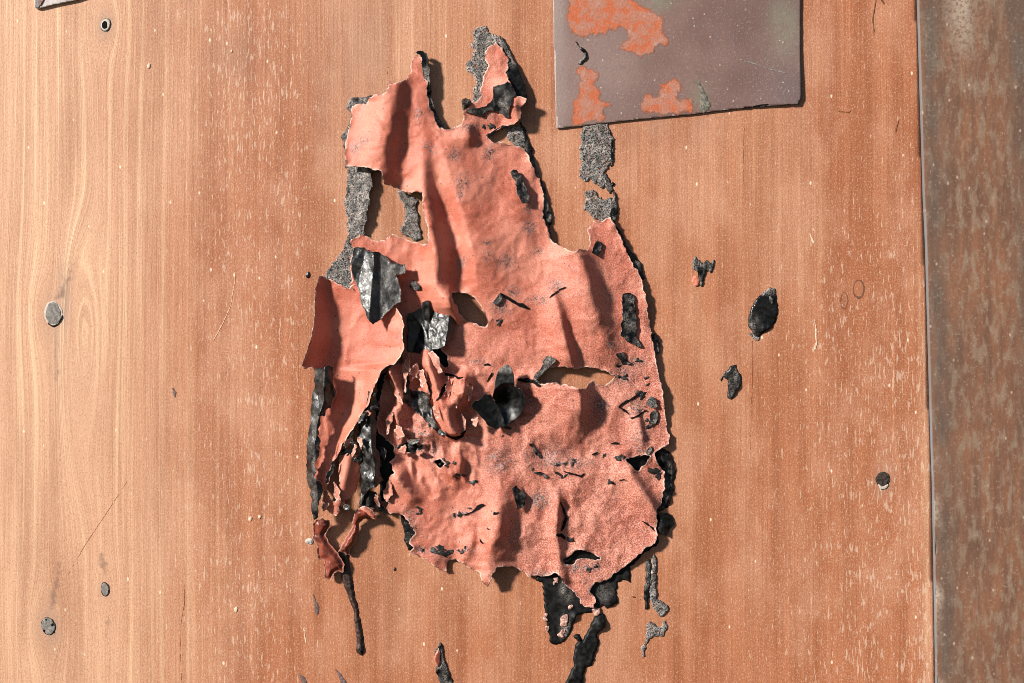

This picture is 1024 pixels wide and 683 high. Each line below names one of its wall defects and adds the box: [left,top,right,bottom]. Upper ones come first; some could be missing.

peeling [302,26,676,683]